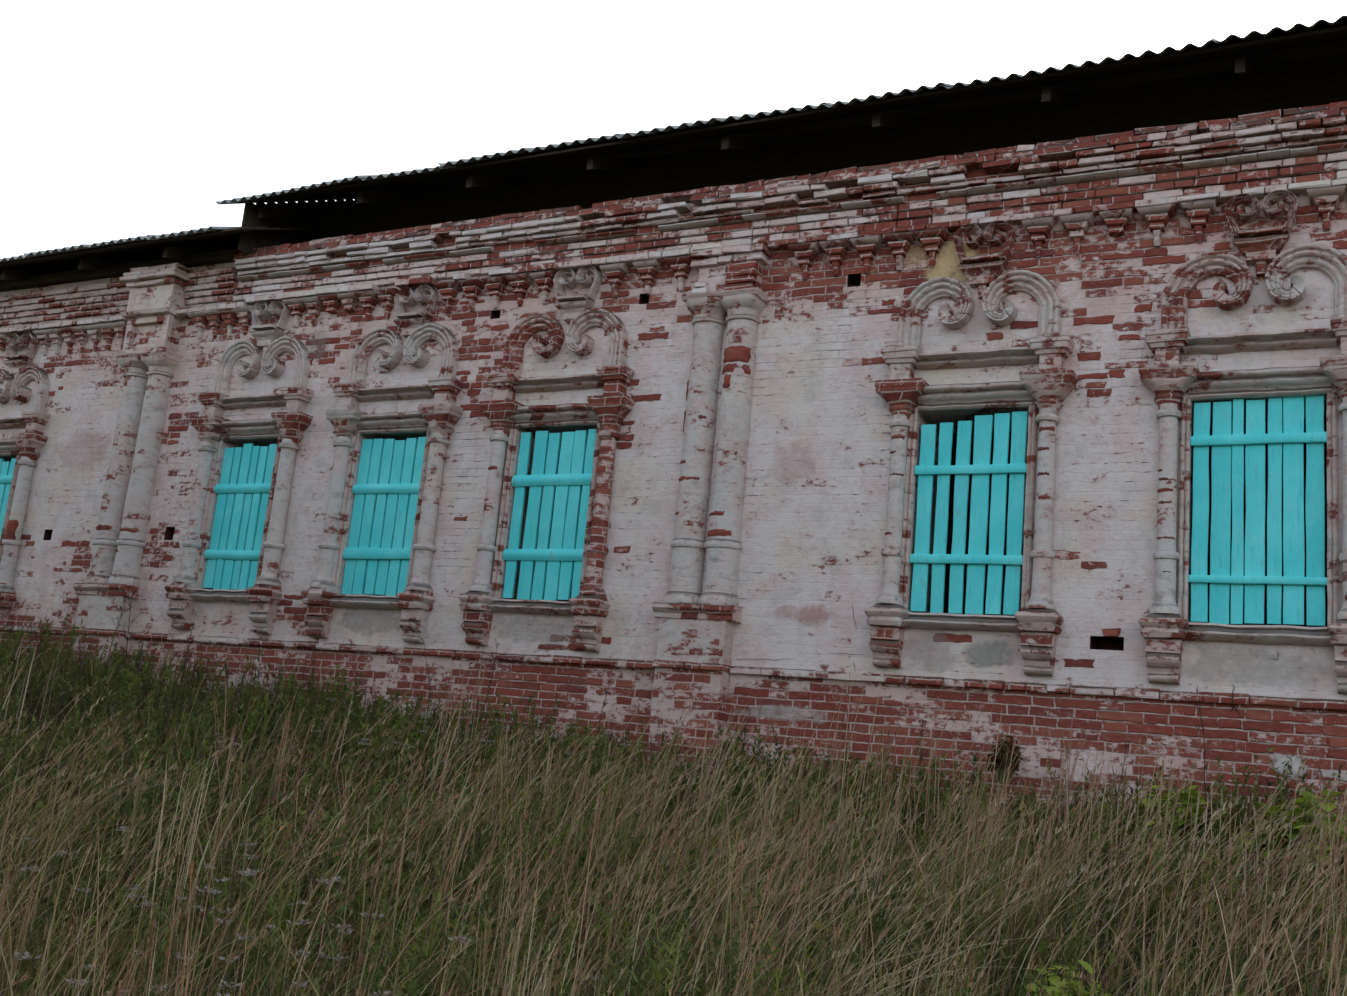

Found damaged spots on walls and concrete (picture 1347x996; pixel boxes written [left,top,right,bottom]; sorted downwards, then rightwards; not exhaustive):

peeling [1287,205,1347,249]
peeling [989,224,1231,278]
peeling [600,263,692,304]
peeling [847,261,931,314]
peeling [1187,283,1217,308]
peeling [638,326,669,340]
peeling [986,321,1038,341]
peeling [1074,315,1140,341]
spalling [722,345,752,389]
peeling [1077,352,1148,398]
spalling [1063,628,1124,668]
peeling [1055,698,1347,760]